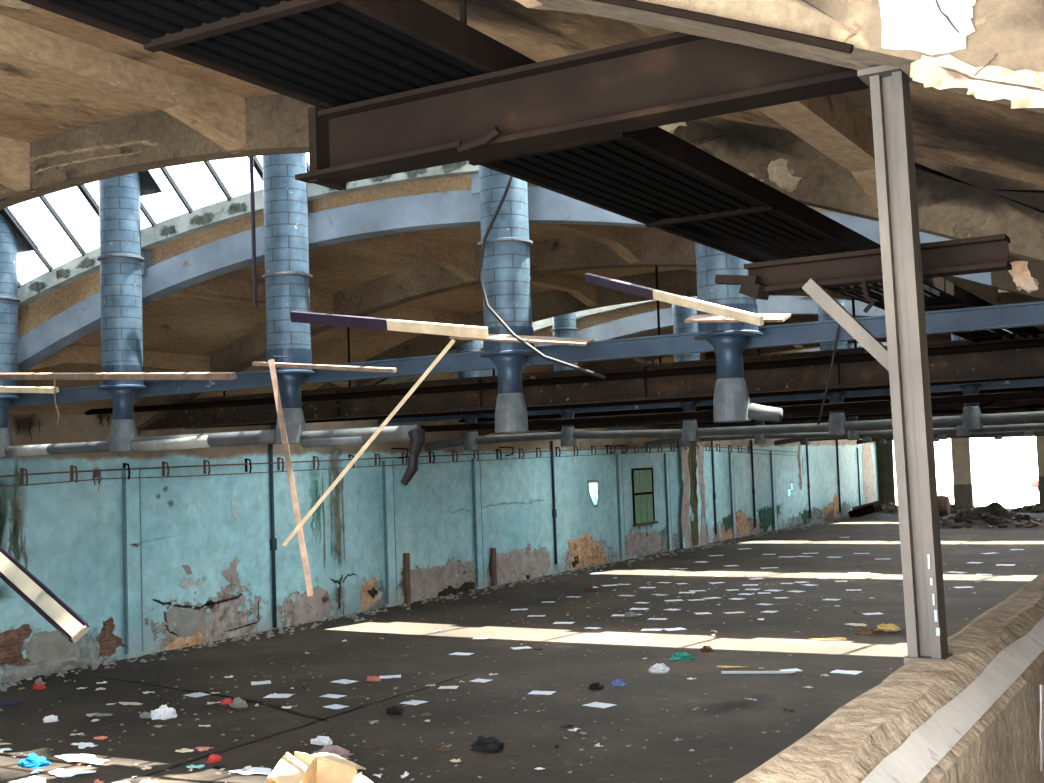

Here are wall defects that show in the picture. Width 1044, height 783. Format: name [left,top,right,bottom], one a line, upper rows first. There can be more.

crack [935,0,960,33]
spalling [910,55,1044,109]
crack [940,53,1044,91]
spalling [748,158,801,192]
spalling [1008,261,1039,293]
damp [0,466,27,569]
damp [311,448,345,568]
flaking render [397,442,769,604]
crack [153,594,259,636]
peeling [145,556,334,652]
flaking render [0,624,36,670]
flaking render [74,616,125,669]